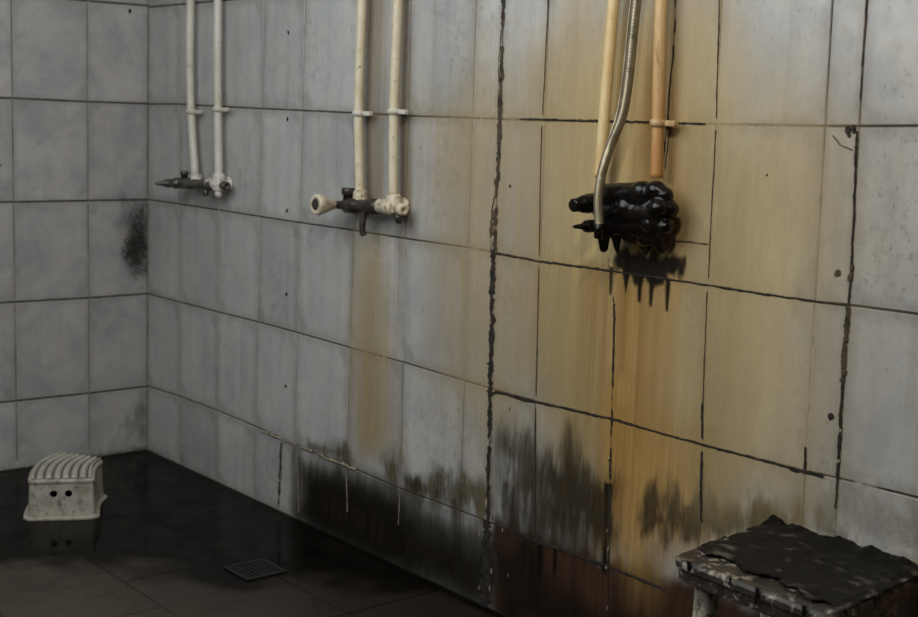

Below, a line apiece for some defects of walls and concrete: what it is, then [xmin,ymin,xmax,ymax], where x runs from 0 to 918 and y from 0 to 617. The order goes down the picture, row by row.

crack [859,0,868,99]
damp [125,209,147,271]
crack [478,0,536,609]
corrosion [548,29,697,551]
corrosion [710,75,808,474]
crack [789,125,858,508]
damp [310,443,349,512]
damp [385,459,492,525]
damp [499,427,612,573]